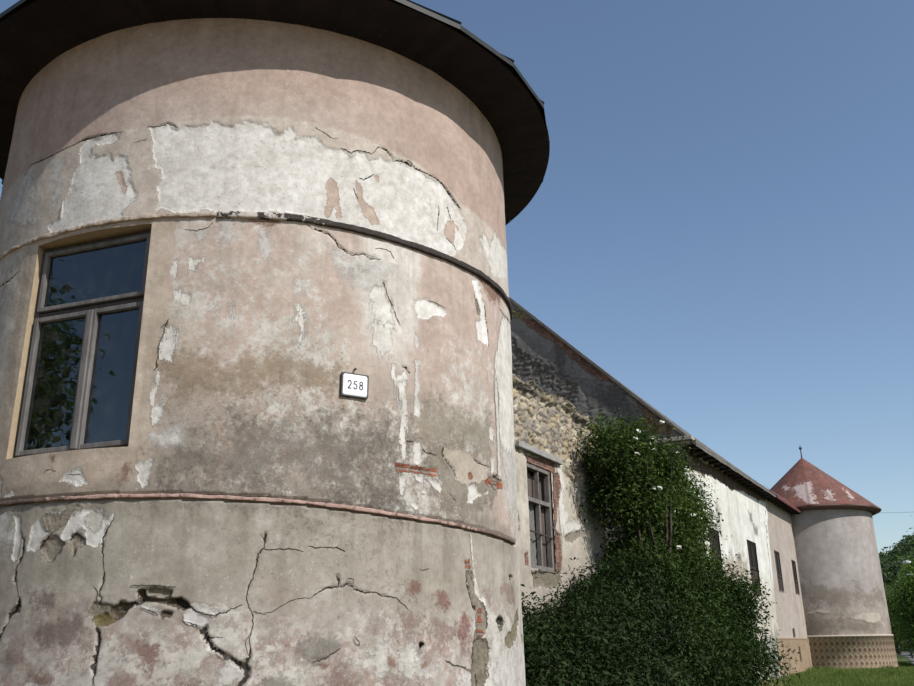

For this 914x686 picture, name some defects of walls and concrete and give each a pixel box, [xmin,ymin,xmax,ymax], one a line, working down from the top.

flaking render [48,133,138,233]
crack [24,123,178,175]
flaking render [170,256,207,306]
flaking render [149,120,467,261]
flaking render [479,232,508,280]
flaking render [135,324,187,489]
flaking render [328,243,616,513]
crack [0,531,25,638]
flaking render [0,467,116,562]
crack [91,517,114,686]
crack [190,533,409,686]
flaking render [465,532,523,686]